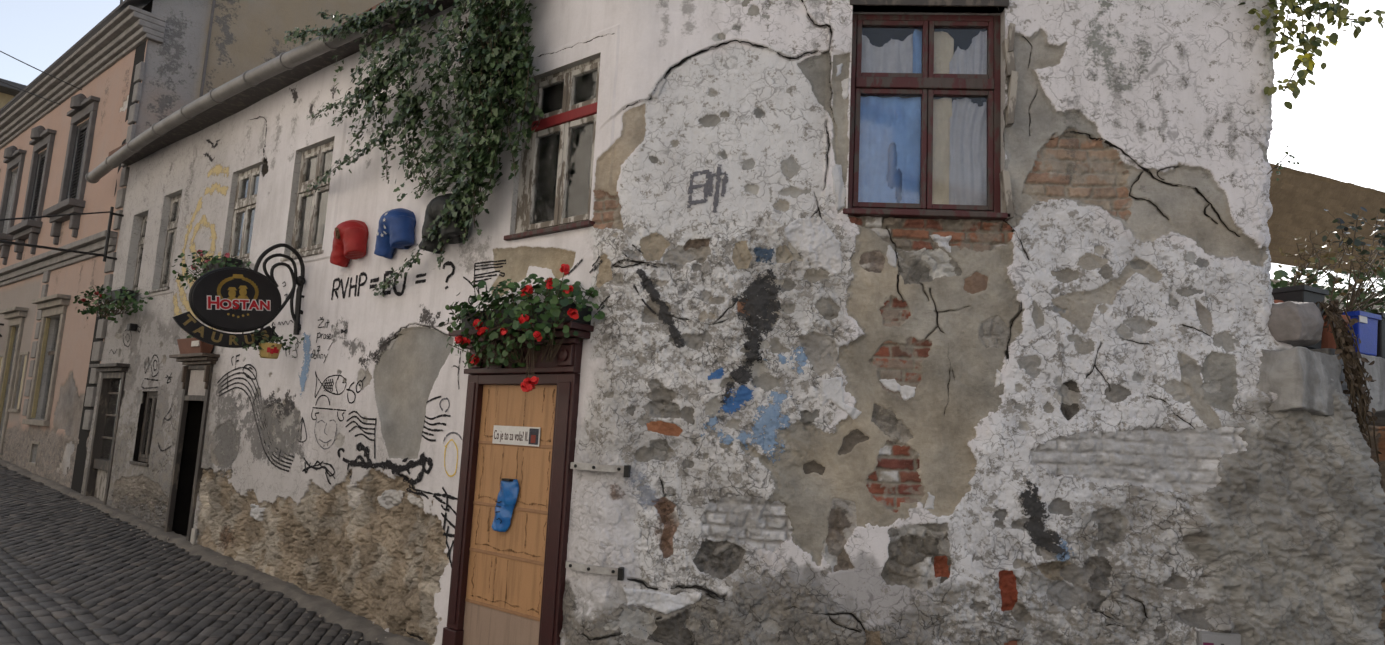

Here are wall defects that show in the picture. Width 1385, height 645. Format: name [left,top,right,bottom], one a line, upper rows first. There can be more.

crack [623,0,836,223]
crack [1022,36,1240,237]
crack [612,259,665,268]
crack [886,227,969,414]
spalling [592,29,1268,580]
spalling [197,326,454,645]
peeling [603,608,718,645]
peeling [970,507,1138,645]
peeling [1153,573,1214,640]